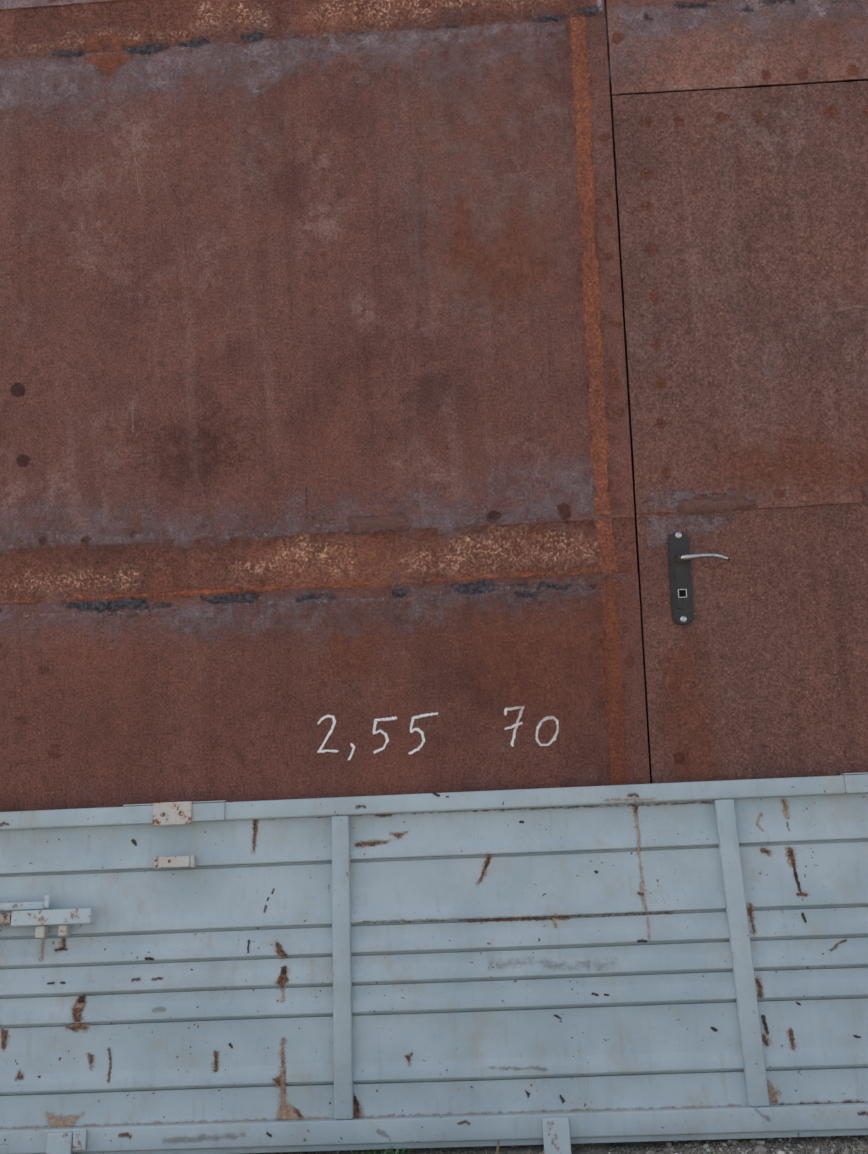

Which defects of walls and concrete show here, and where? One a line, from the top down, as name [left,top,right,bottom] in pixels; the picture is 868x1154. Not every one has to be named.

rust [156,1,269,38]
rust [309,0,488,30]
rust [11,383,25,397]
rust [0,503,599,603]